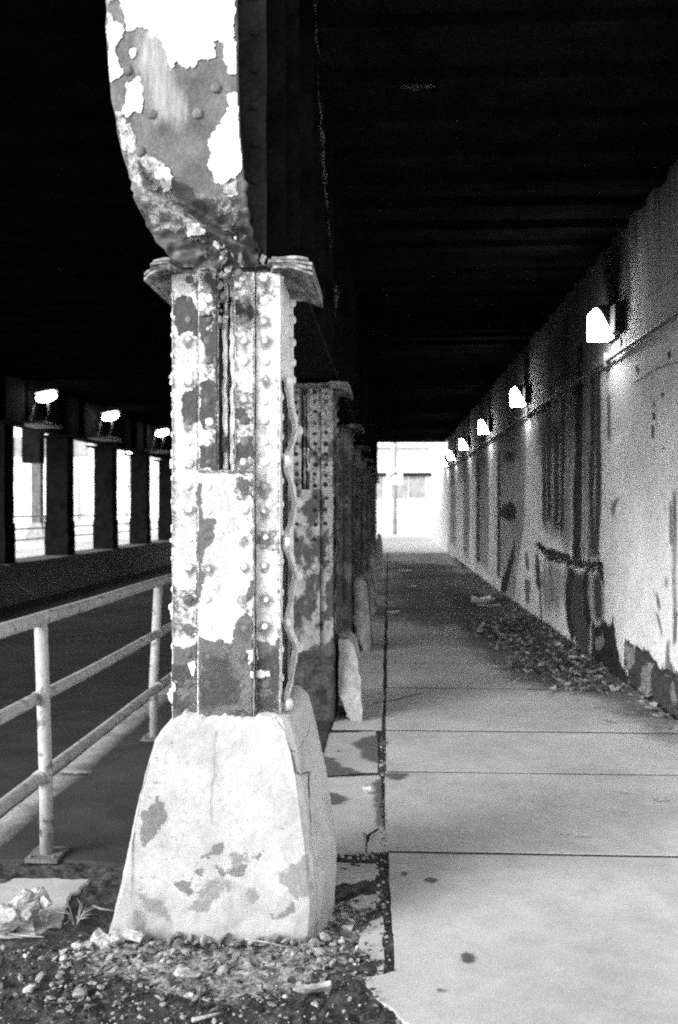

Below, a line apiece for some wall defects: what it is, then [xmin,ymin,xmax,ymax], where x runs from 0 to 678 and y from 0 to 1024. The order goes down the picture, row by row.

peeling [106,0,237,194]
peeling [207,92,242,197]
peeling [173,287,215,359]
peeling [177,482,218,607]
peeling [181,378,217,430]
corrosion [139,180,280,668]
peeling [199,406,272,511]
leakage [390,231,671,734]
peeling [172,580,281,720]
crack [362,828,380,853]